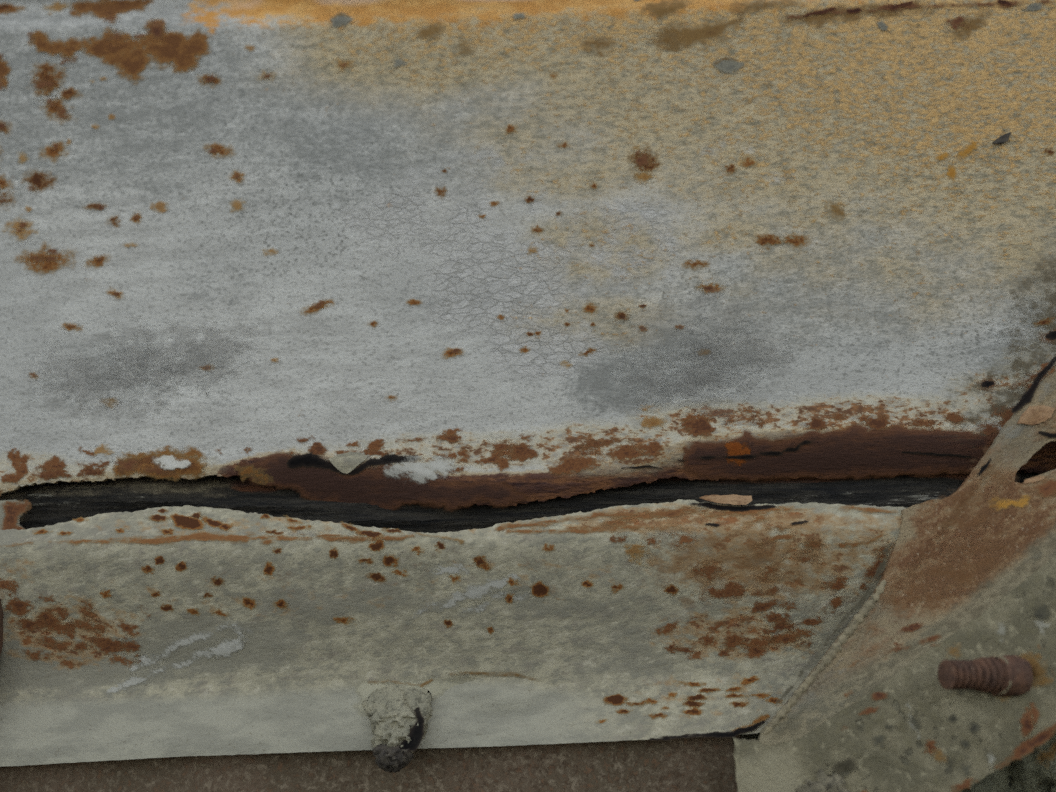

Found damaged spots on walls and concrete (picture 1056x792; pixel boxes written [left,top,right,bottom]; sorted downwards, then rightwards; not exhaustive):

rust [27,0,221,121]
rust [0,444,205,496]
peeling [329,452,368,474]
rust [238,428,538,510]
spalling [384,456,454,483]
rust [681,405,1055,481]
peeling [0,499,31,530]
rust [12,508,445,582]
rust [497,494,821,565]
rust [0,579,141,669]
rust [656,560,848,659]
rust [603,676,782,719]